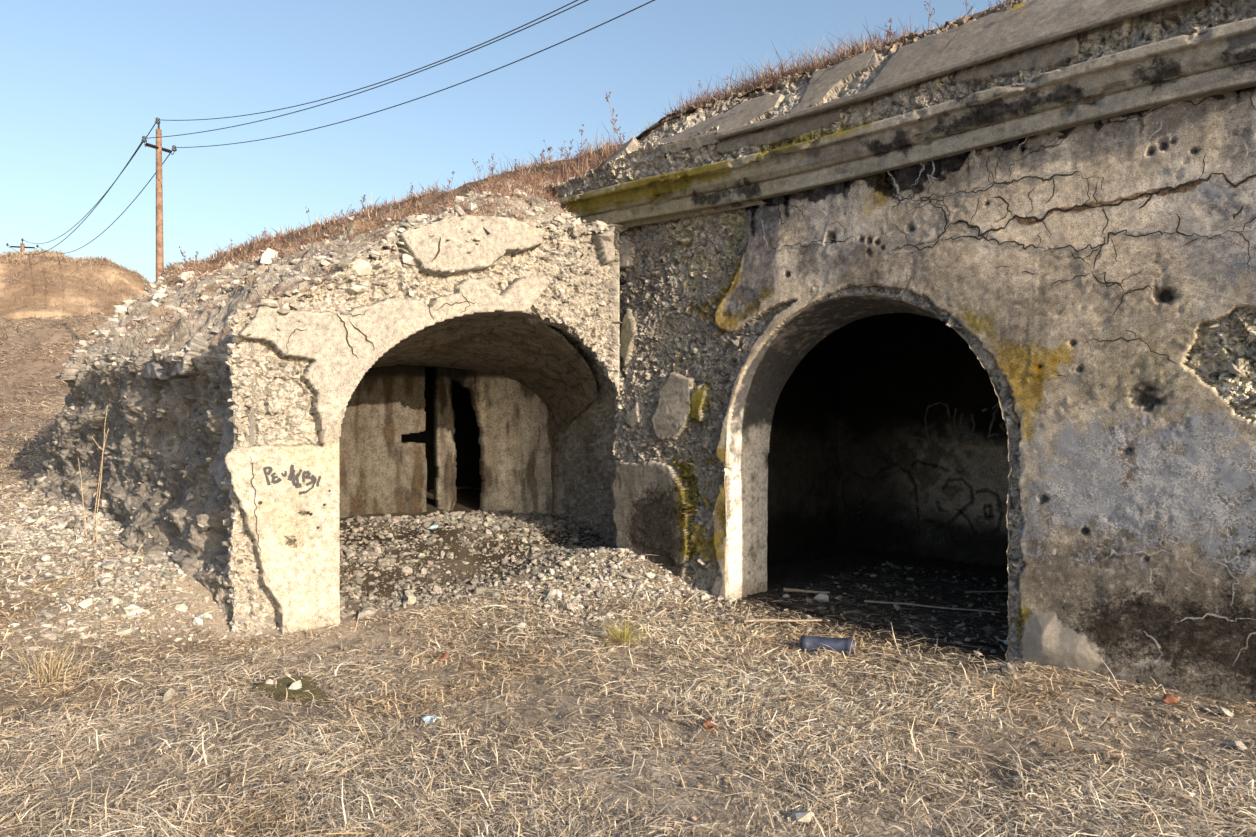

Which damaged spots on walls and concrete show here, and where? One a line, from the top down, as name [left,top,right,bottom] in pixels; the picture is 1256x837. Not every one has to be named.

water stain [934,82,1081,136]
water stain [1091,109,1165,152]
water stain [1133,58,1182,87]
water stain [1211,87,1255,103]
crack [769,192,854,252]
water stain [692,127,1075,282]
crack [890,96,1256,364]
crack [337,309,375,358]
spalling [26,207,1256,662]
water stain [629,482,694,578]
water stain [1064,514,1256,700]